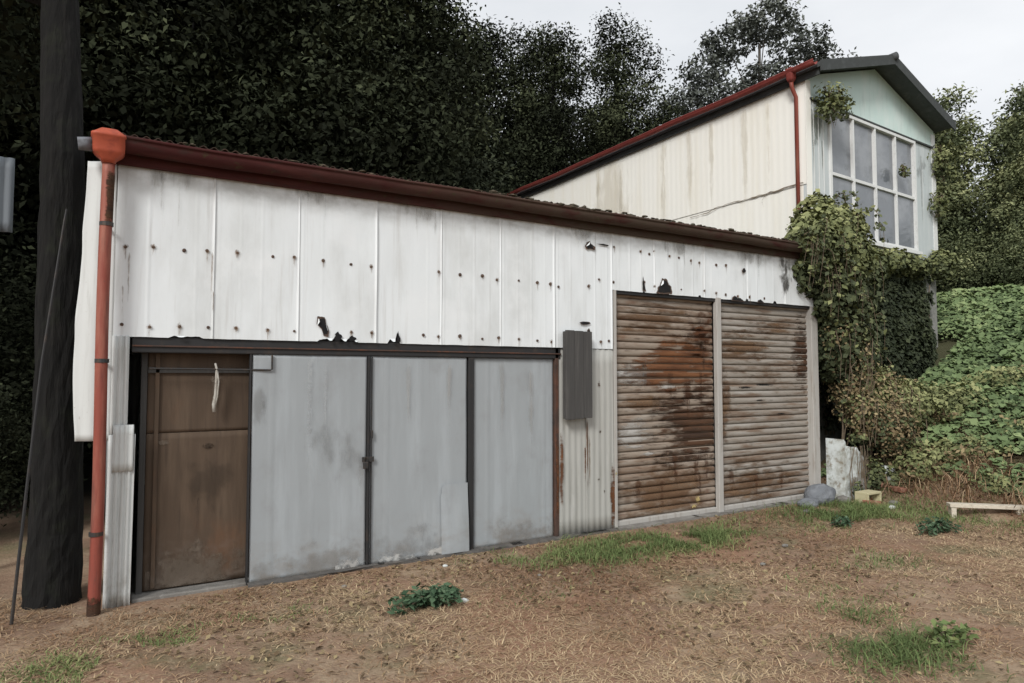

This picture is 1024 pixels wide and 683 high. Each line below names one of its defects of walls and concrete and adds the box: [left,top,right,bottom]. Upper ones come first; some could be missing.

peeling [328,332,358,342]
corrosion [585,278,808,525]
corrosion [556,439,564,513]